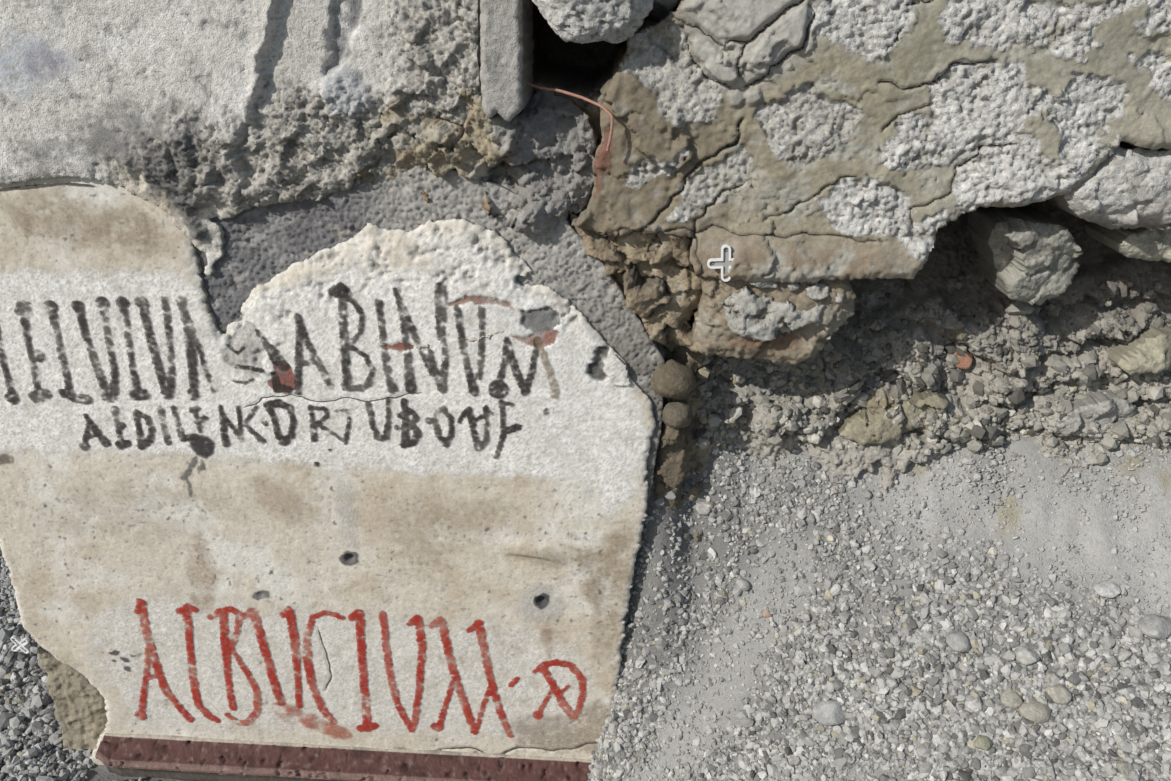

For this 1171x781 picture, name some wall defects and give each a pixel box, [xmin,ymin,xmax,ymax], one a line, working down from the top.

crack [673,0,815,88]
crack [888,0,933,47]
spalling [754,82,863,165]
crack [879,60,992,129]
spalling [807,0,1171,261]
crack [0,182,94,190]
crack [598,120,880,277]
crack [910,143,1013,227]
spalling [221,321,264,377]
spalling [381,342,429,351]
spalling [445,296,560,347]
flaking render [588,346,630,386]